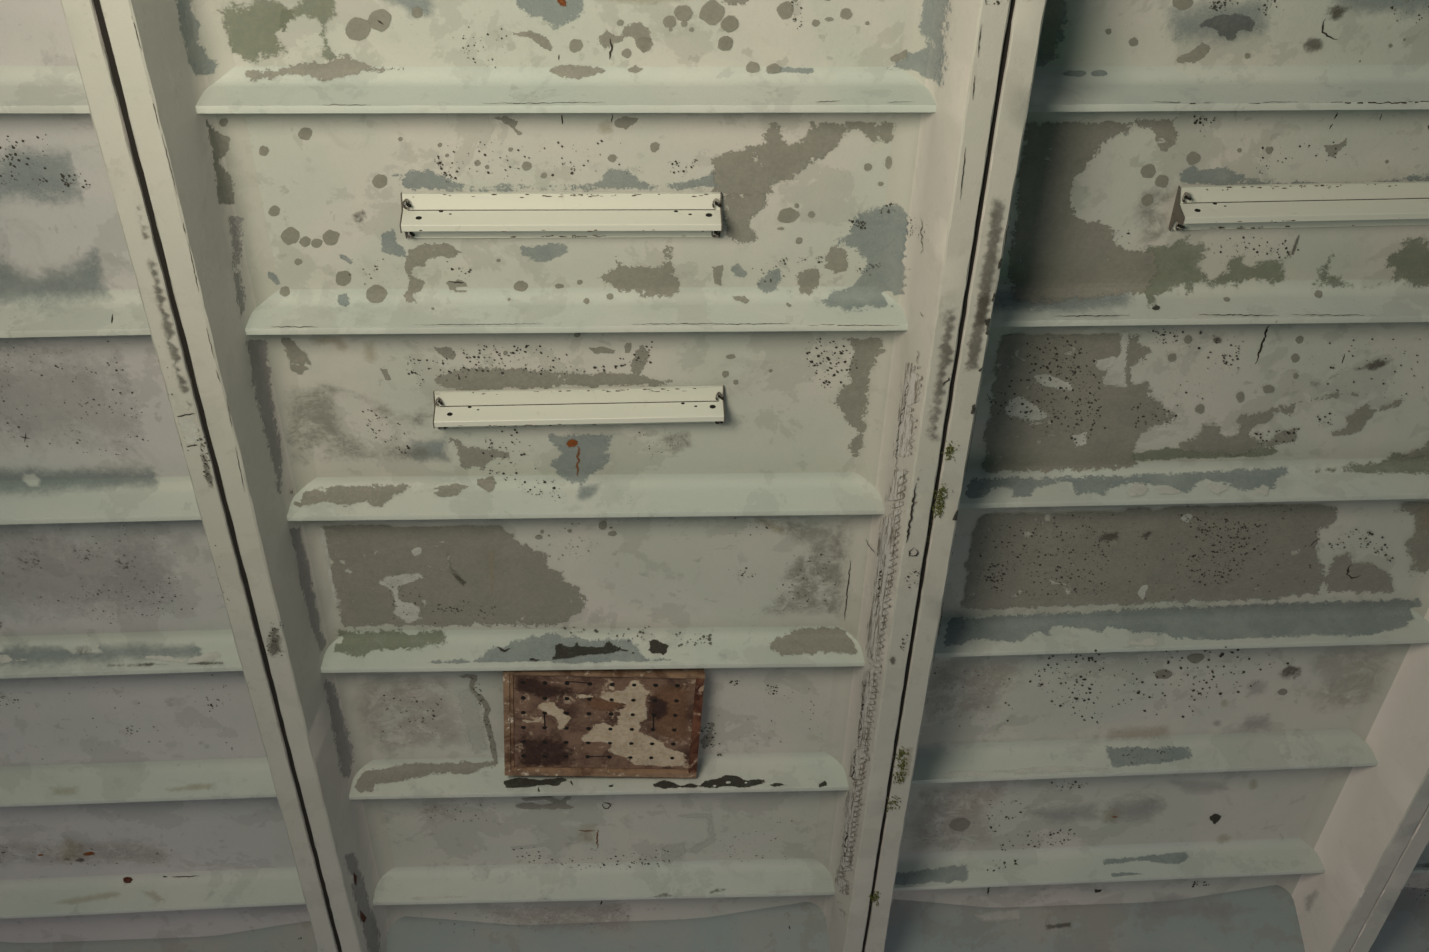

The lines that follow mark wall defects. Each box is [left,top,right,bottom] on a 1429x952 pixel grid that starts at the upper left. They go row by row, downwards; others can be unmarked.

peeling [692,121,897,244]
peeling [712,265,750,304]
peeling [786,245,848,307]
peeling [971,118,1179,473]
peeling [1178,392,1402,456]
peeling [289,483,412,507]
peeling [319,524,588,629]
peeling [960,505,1394,611]
peeling [1394,502,1429,577]
spalling [552,639,669,660]